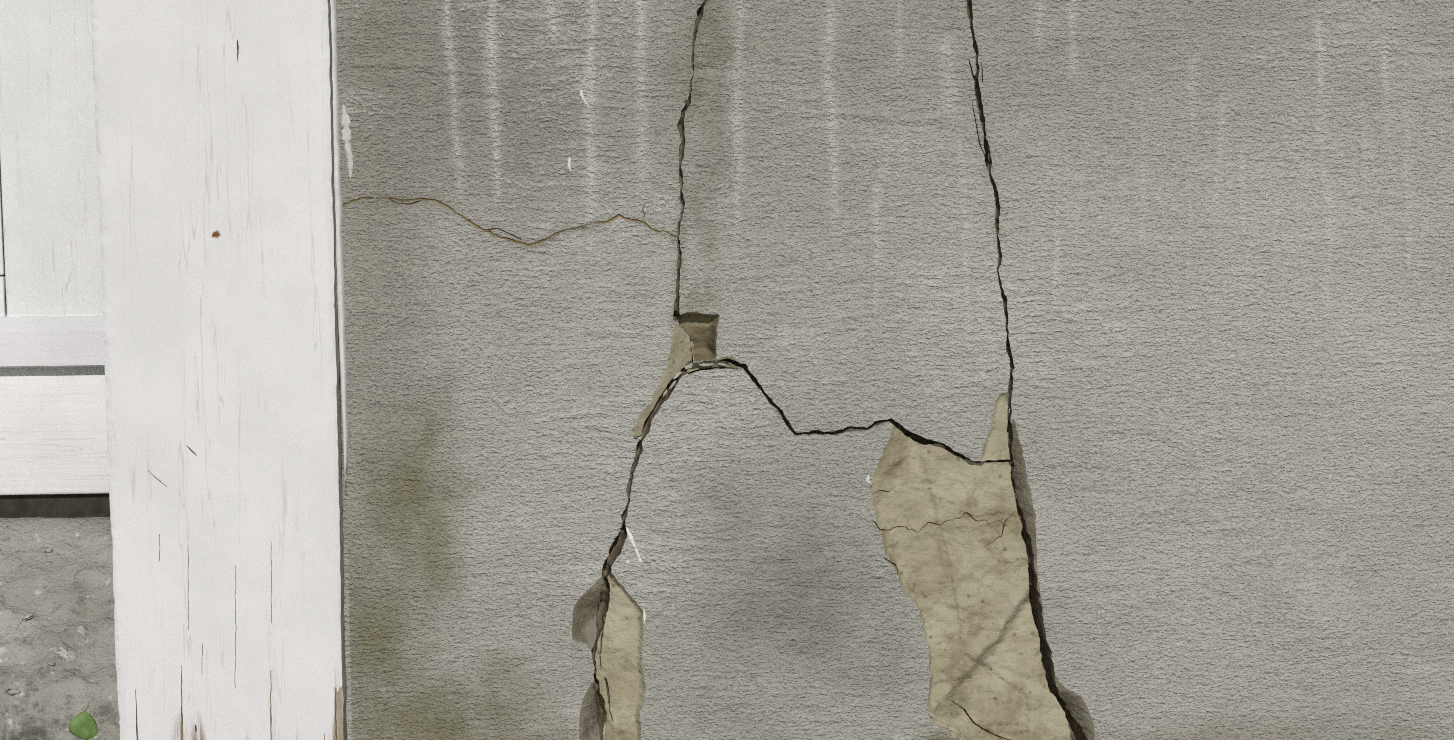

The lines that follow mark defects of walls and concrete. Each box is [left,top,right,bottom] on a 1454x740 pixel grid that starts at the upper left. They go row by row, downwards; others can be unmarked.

damp [486,0,499,191]
crack [343,0,708,321]
damp [583,0,597,231]
damp [636,0,646,175]
damp [826,2,838,208]
flaking render [631,312,744,438]
crack [591,0,1088,740]
peeling [333,686,344,740]
flaking render [571,573,646,740]
flaking render [866,393,1095,740]